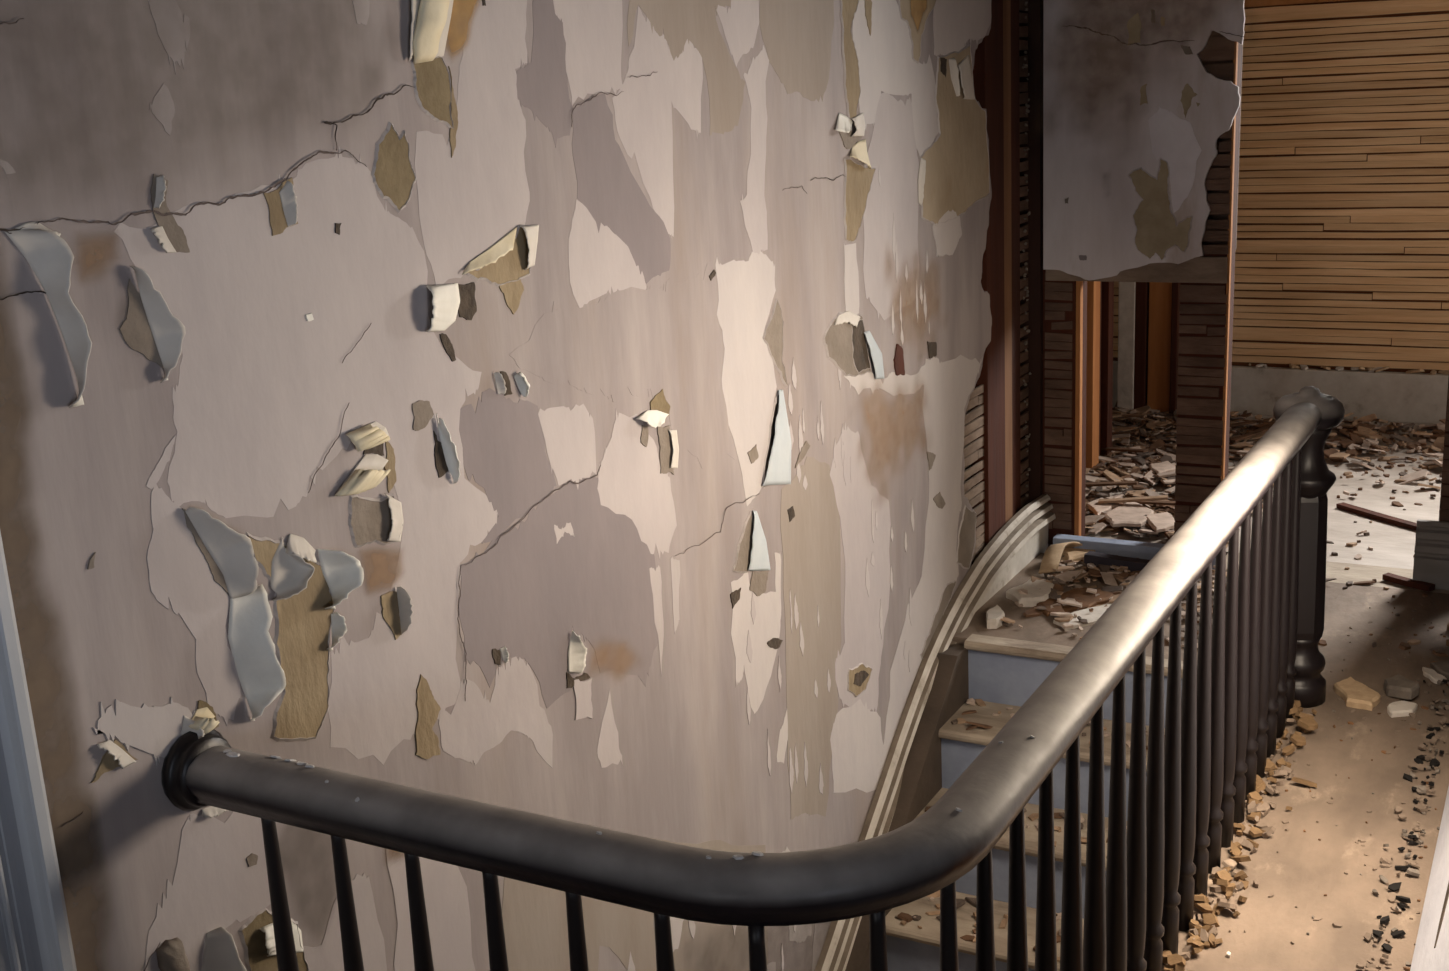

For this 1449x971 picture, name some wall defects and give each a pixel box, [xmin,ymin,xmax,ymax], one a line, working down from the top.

crack [0,85,412,234]
flaking render [1128,83,1202,261]
crack [0,291,46,300]
peeling [5,221,92,408]
peeling [90,0,991,795]
crack [457,465,601,701]
crack [676,493,760,556]
peeling [144,806,278,971]
peeling [291,849,476,971]
peeling [502,877,831,971]
peeling [652,838,790,853]